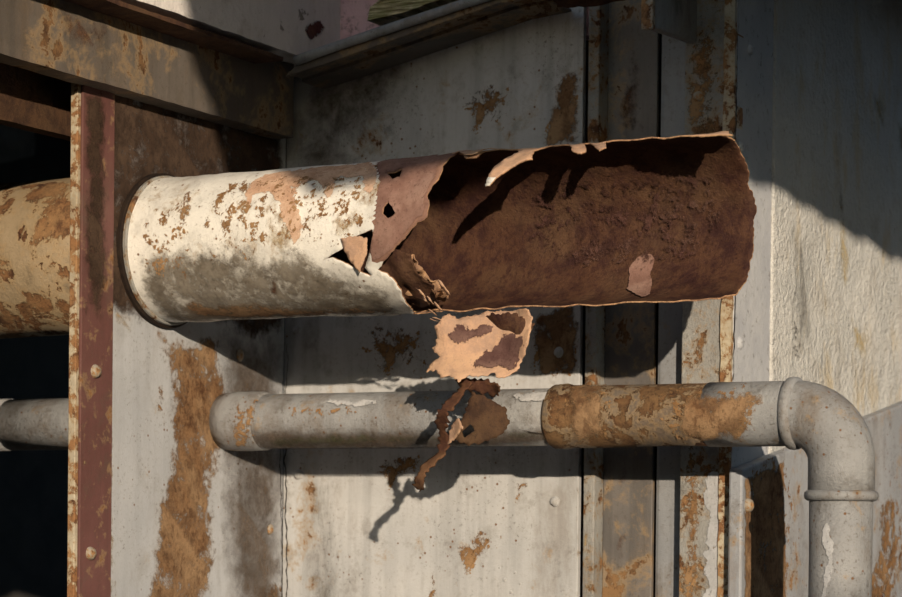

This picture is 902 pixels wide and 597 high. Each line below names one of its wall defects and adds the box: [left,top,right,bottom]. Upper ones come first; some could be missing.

rust [463,85,509,134]
rust [544,73,582,146]
rust [528,307,588,376]
rust [149,332,258,597]
rust [660,383,761,597]
rust [745,448,794,597]
rust [872,499,902,597]